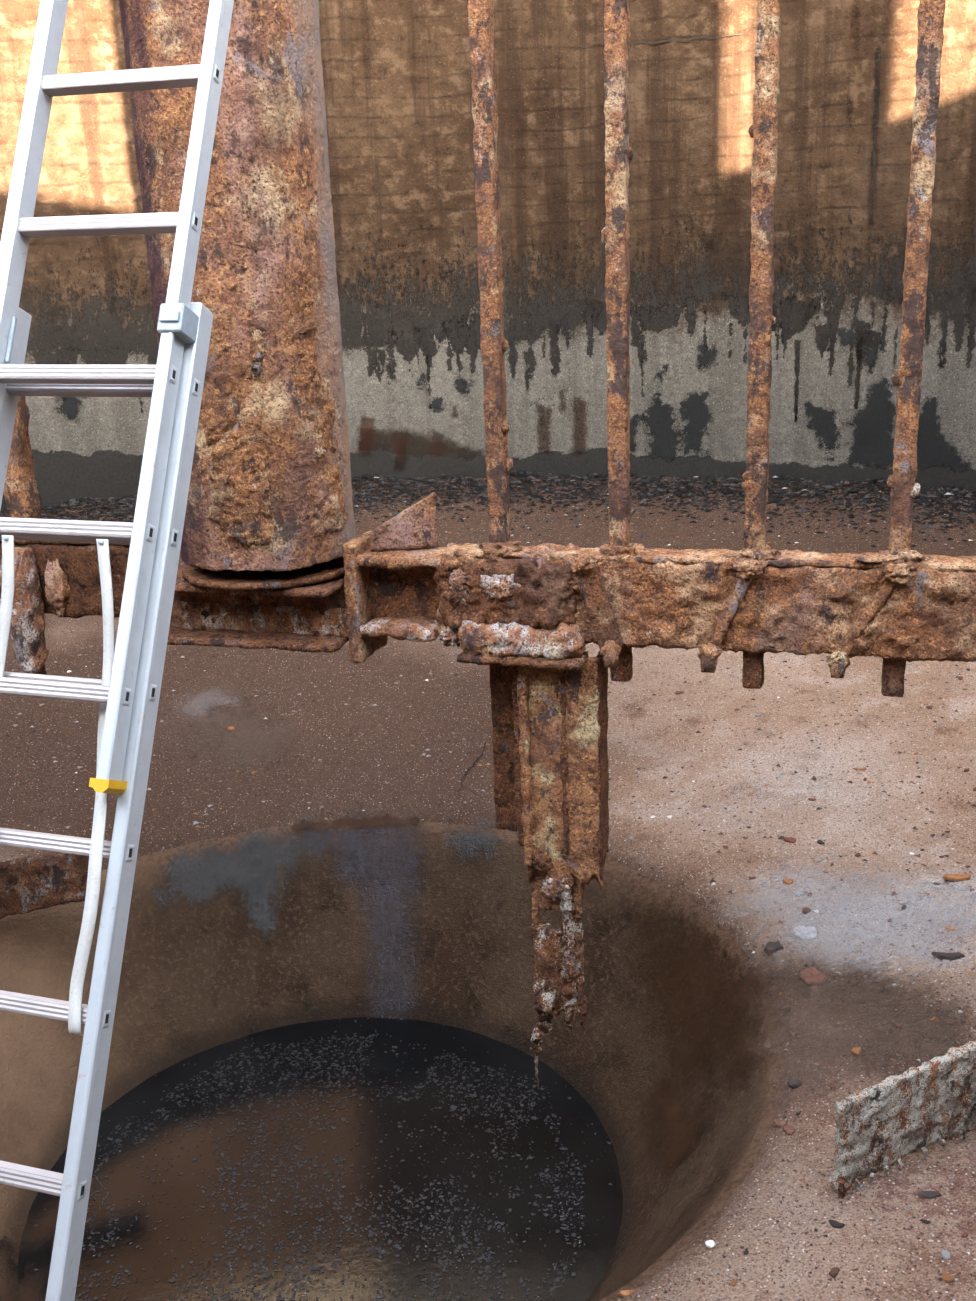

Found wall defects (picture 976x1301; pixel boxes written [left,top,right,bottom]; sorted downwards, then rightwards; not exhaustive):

water stain [19,237,158,365]
water stain [337,215,481,413]
water stain [501,213,607,392]
water stain [629,198,751,479]
water stain [768,47,907,485]
water stain [925,180,976,368]
water stain [32,449,143,508]
water stain [350,429,486,483]
water stain [508,448,608,477]
water stain [915,393,976,491]